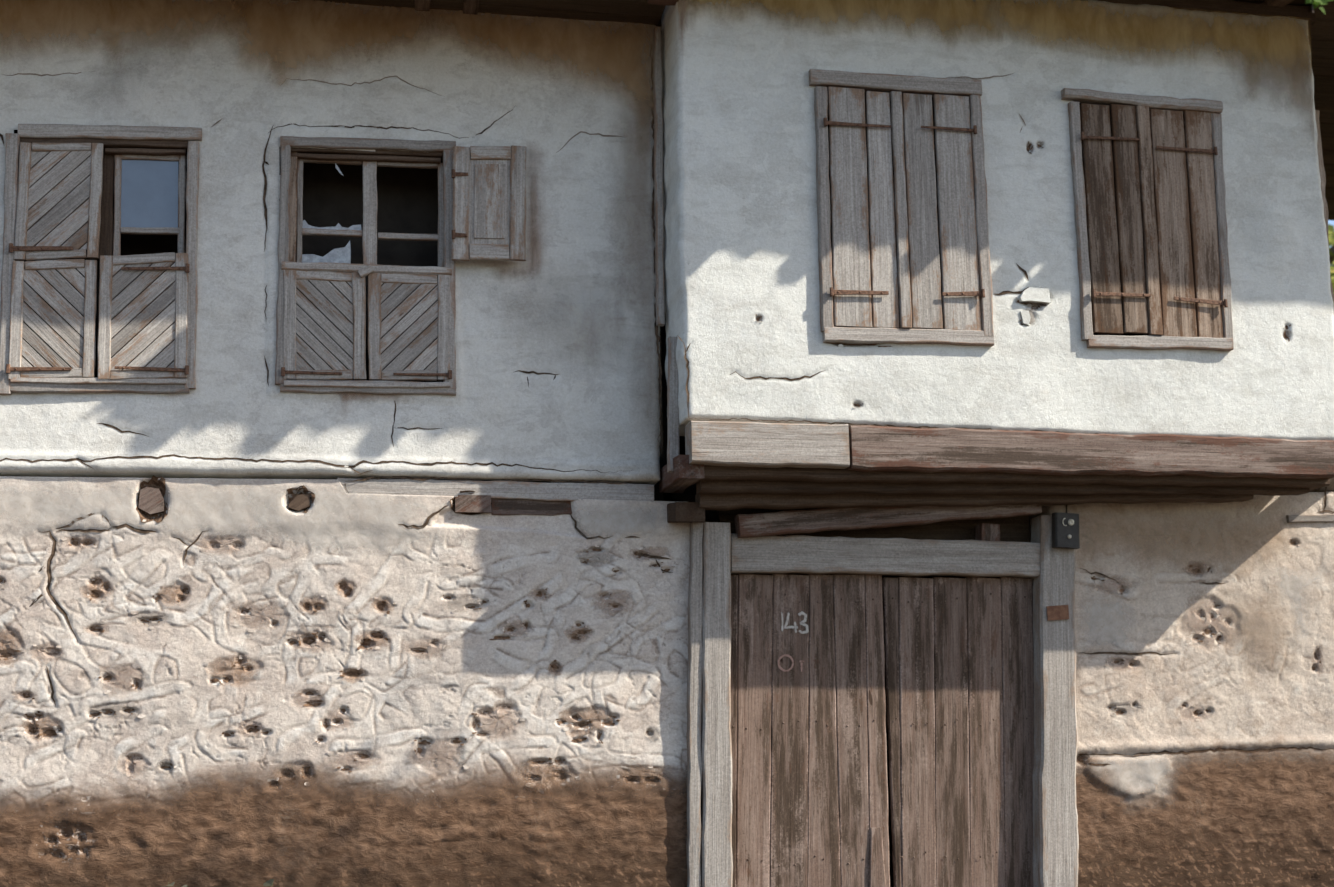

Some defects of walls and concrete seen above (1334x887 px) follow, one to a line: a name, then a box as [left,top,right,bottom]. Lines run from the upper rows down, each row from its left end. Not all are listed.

leakage [691,0,1312,72]
crack [2,69,93,77]
crack [280,76,442,96]
crack [262,105,516,251]
crack [556,45,1124,449]
spalling [1016,287,1051,326]
crack [515,370,559,386]
crack [0,403,633,534]
crack [570,514,673,573]
crack [30,512,206,641]
crack [1082,649,1175,657]
crack [46,666,56,707]